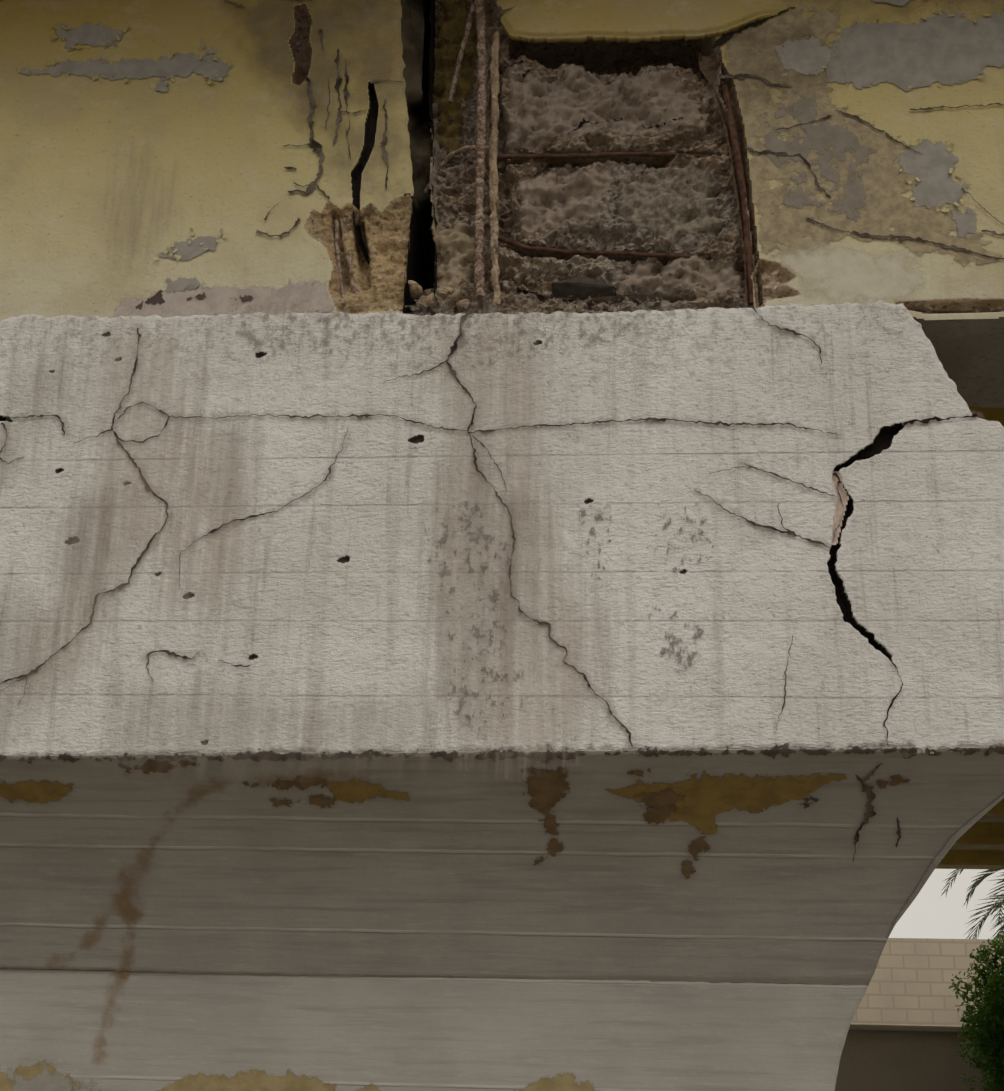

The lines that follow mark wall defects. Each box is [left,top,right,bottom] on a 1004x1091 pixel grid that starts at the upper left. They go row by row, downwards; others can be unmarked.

peeling [19,20,232,92]
crack [256,29,403,265]
spalling [424,0,1004,314]
crack [745,110,922,198]
crack [910,103,1004,111]
spalling [114,190,412,318]
crack [806,187,1004,260]
crack [0,304,978,861]
peeling [243,776,410,808]
peeling [521,766,570,865]
peeling [605,769,846,880]
peeling [159,1069,336,1091]